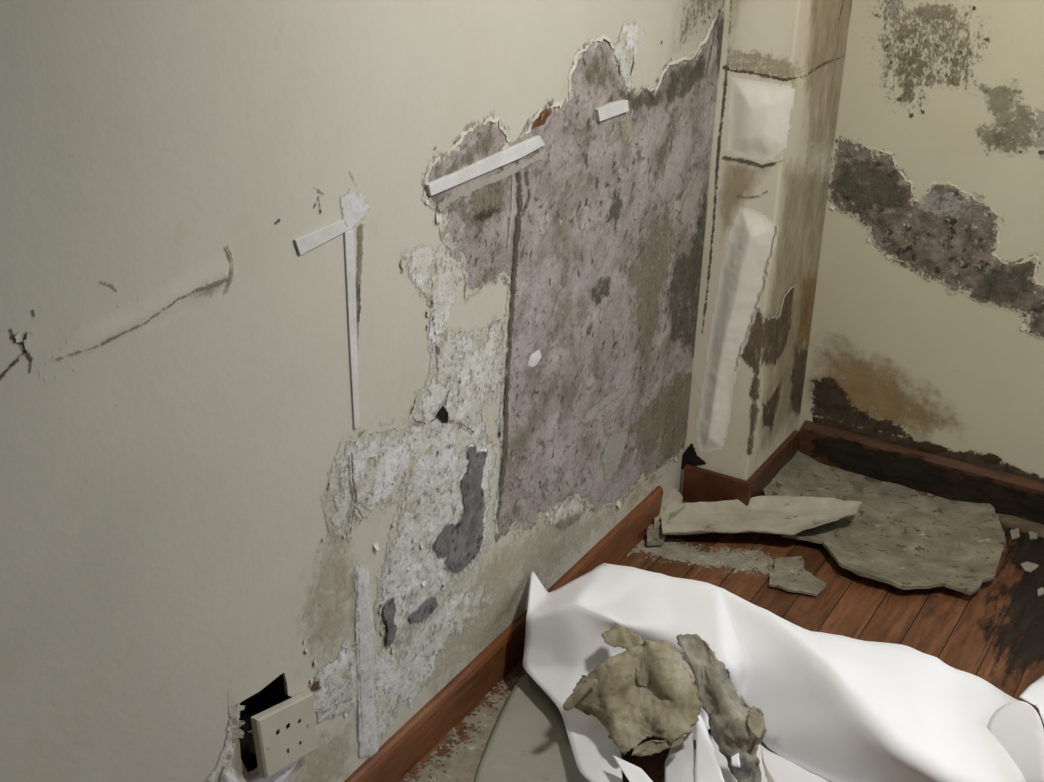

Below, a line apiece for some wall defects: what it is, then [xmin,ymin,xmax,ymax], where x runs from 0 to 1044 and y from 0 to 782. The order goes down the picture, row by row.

damp [681,0,849,140]
damp [875,0,1044,155]
crack [0,309,38,380]
crack [59,246,233,360]
flaking render [321,6,724,654]
damp [661,372,692,458]
damp [667,198,707,357]
damp [762,179,1044,686]
spalling [207,627,363,782]